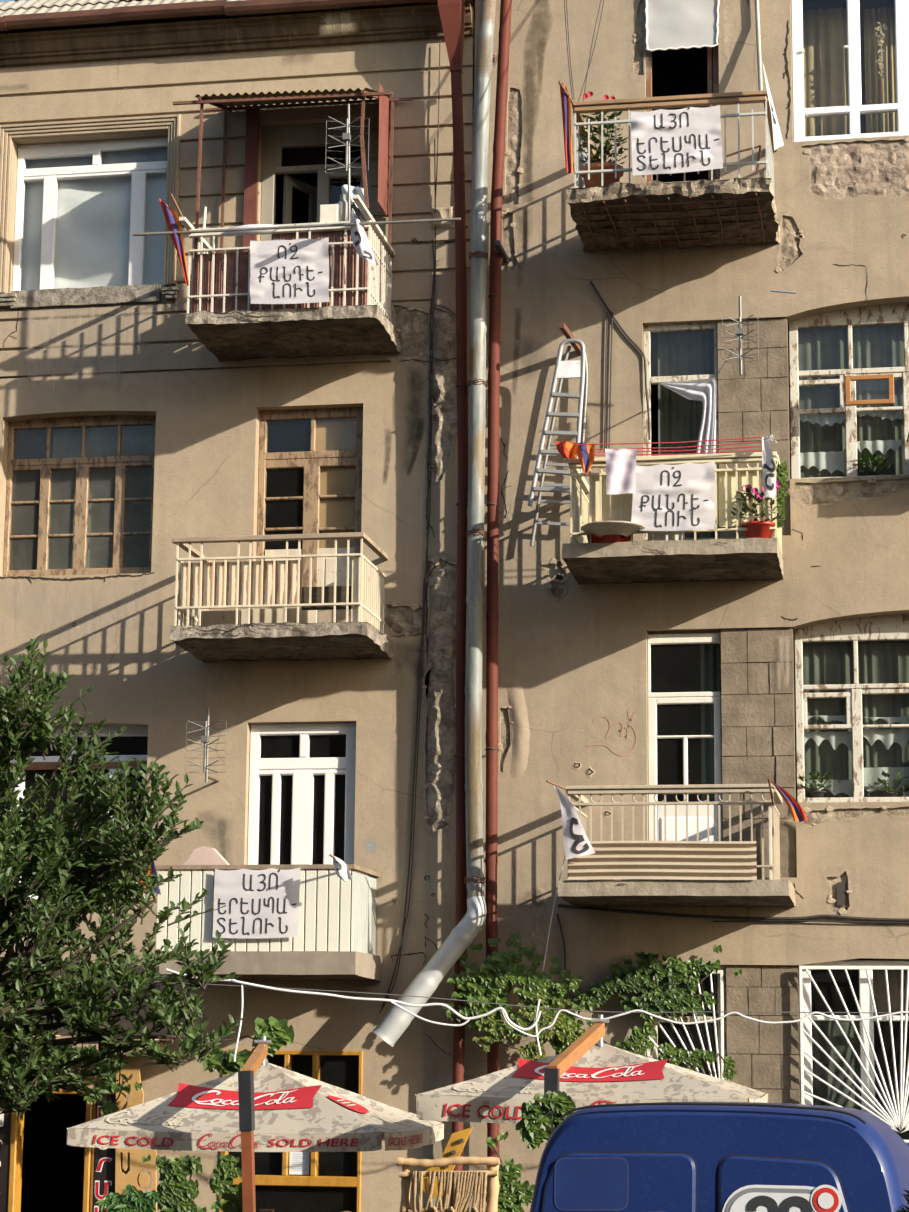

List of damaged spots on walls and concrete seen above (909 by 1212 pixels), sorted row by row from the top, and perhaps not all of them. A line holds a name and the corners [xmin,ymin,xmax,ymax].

leakage [524,0,547,182]
spalling [775,213,804,273]
spalling [392,304,433,362]
spalling [384,603,426,636]